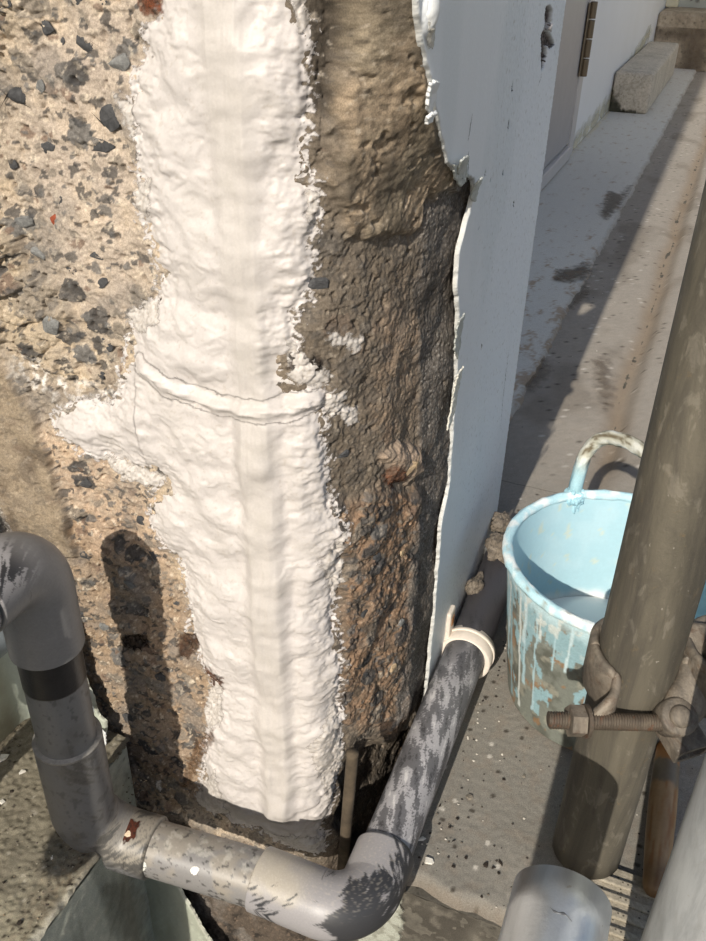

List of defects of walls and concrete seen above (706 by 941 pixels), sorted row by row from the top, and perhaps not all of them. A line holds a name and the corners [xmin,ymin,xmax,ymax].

rust [138,0,162,15]
peeling [540,8,555,67]
spalling [0,0,485,870]
spalling [182,888,318,941]